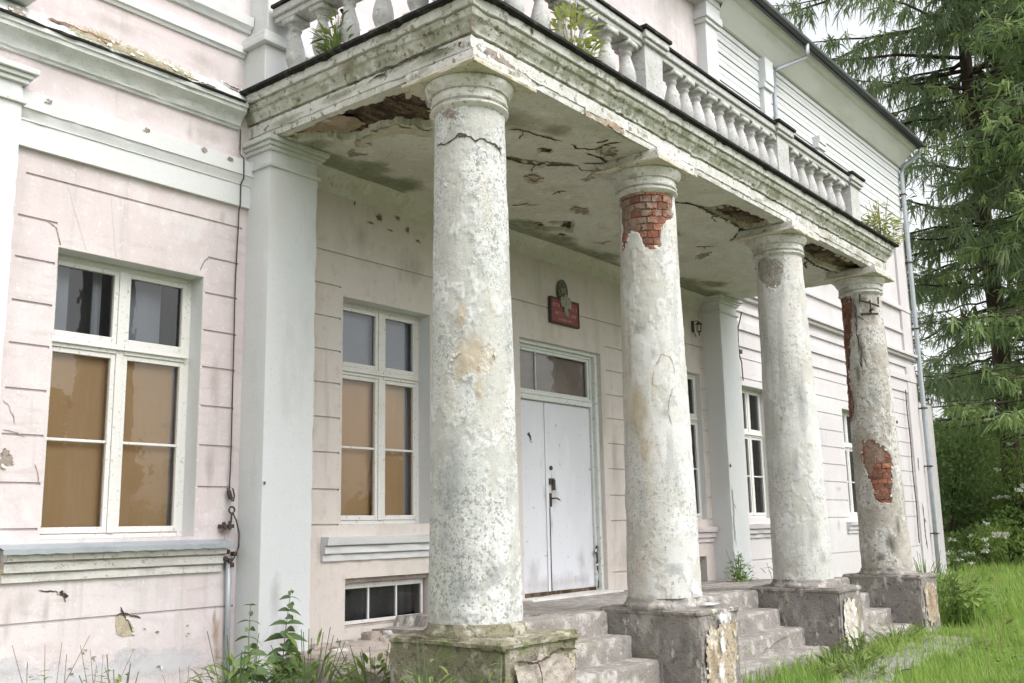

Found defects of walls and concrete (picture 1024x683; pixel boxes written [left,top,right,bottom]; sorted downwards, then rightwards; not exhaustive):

peeling [96,39,242,91]
spalling [286,92,459,157]
crack [437,129,622,172]
flaking render [620,191,682,253]
crack [675,202,746,248]
spalling [804,243,860,272]
crack [652,354,675,424]
flaking render [841,297,855,427]
peeling [0,448,15,469]
flaking render [860,437,893,503]
peeling [924,581,940,626]
peeling [706,620,739,683]